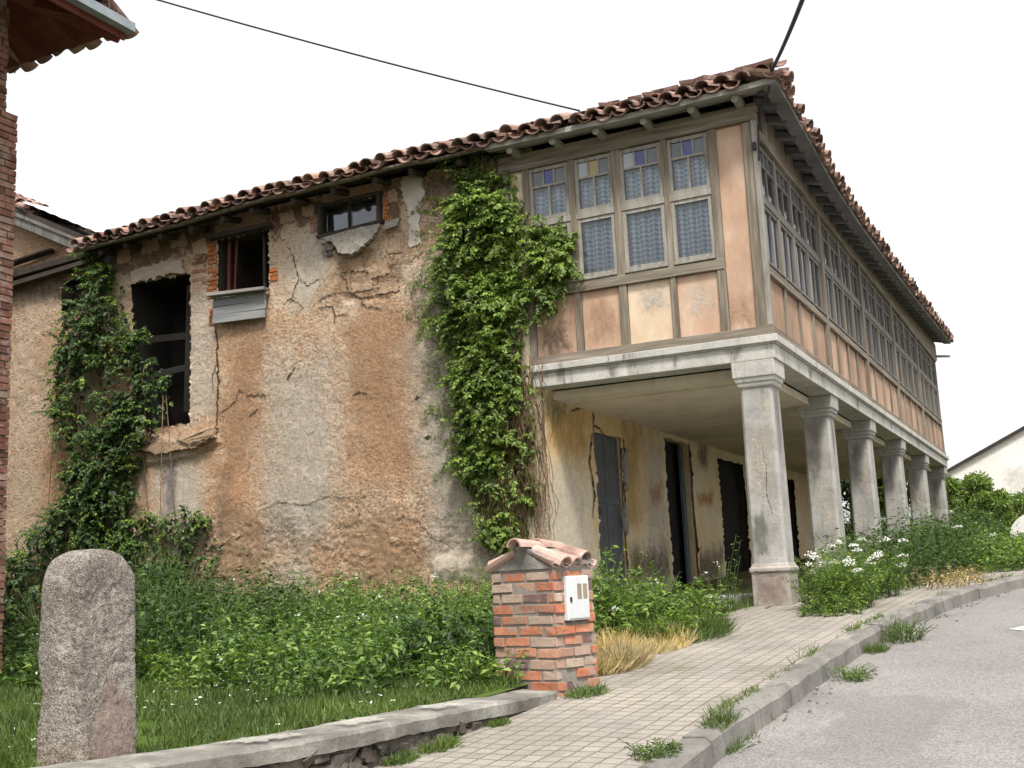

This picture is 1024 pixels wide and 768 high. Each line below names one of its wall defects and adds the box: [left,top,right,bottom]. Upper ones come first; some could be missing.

spalling [265,178,404,306]
crack [284,245,395,322]
crack [176,326,270,446]
crack [258,492,382,527]
crack [571,407,625,517]
water stain [632,551,670,580]